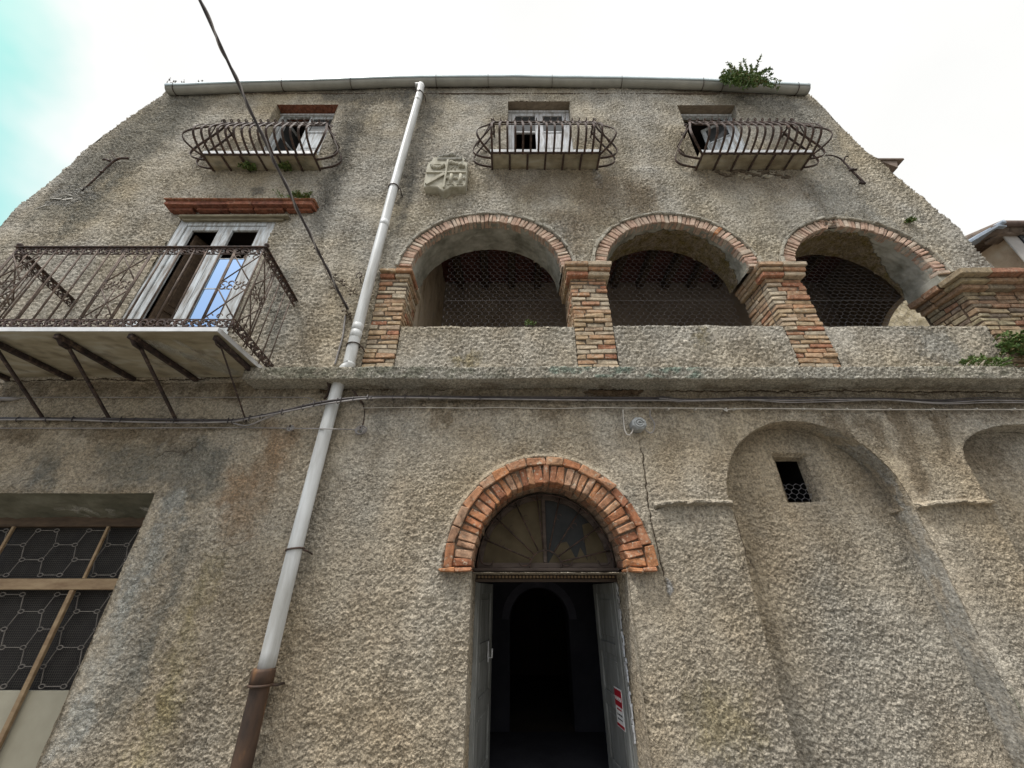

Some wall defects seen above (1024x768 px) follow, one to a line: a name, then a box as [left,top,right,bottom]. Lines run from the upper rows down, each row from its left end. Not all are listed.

crack [639,442,665,581]